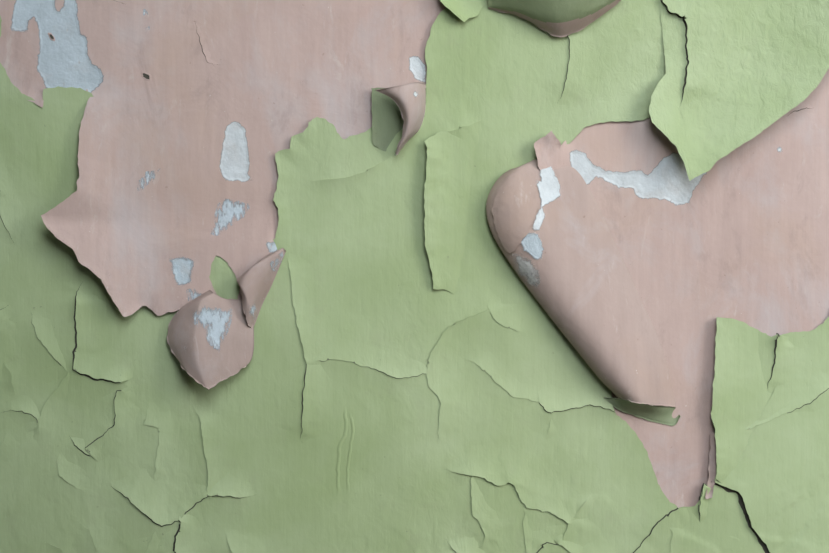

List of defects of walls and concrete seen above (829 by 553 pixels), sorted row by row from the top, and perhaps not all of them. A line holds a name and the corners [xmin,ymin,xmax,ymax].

crack [0,280,276,553]
peeling [0,0,485,317]
crack [262,253,829,553]
peeling [534,0,829,508]